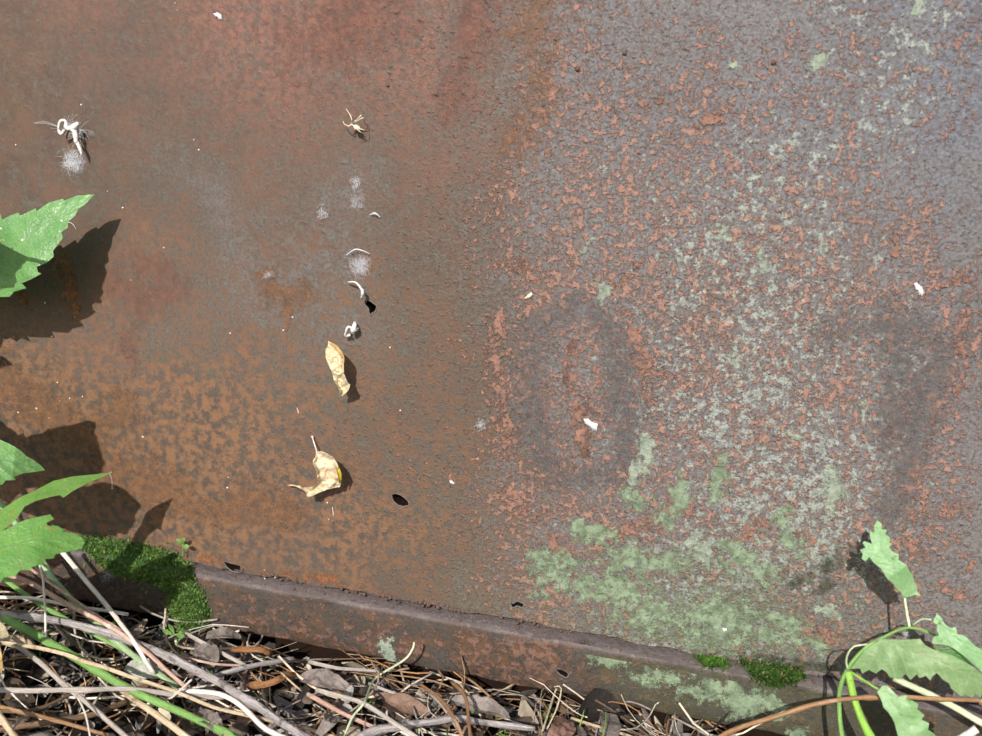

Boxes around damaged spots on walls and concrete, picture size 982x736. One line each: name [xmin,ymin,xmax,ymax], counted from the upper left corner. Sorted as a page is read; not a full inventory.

rust [472,300,525,462]
rust [588,492,700,551]
damp [526,506,808,592]
damp [619,452,731,532]
damp [588,655,631,671]
damp [761,611,839,671]